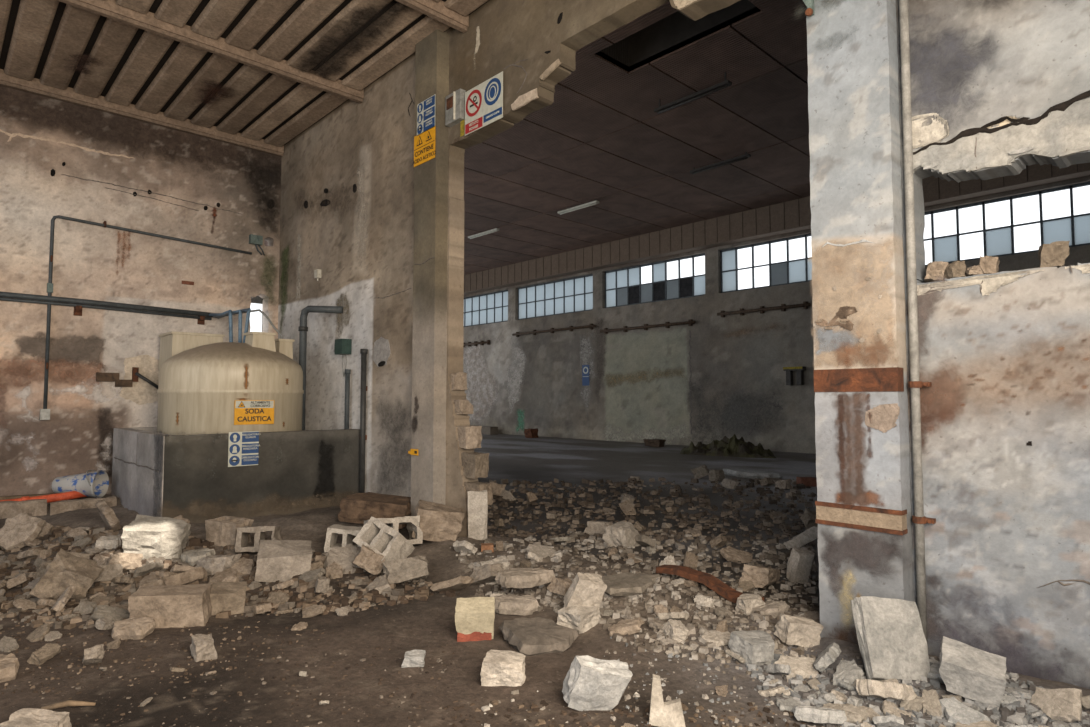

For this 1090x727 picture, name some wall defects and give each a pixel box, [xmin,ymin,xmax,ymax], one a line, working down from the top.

spalling [673,0,697,9]
damp [298,3,410,78]
spalling [511,59,561,111]
spalling [902,98,1090,175]
spalling [917,269,1045,296]
spalling [1065,264,1090,274]
corrosion [815,393,907,516]
corrosion [815,519,908,535]
crack [1037,579,1090,588]